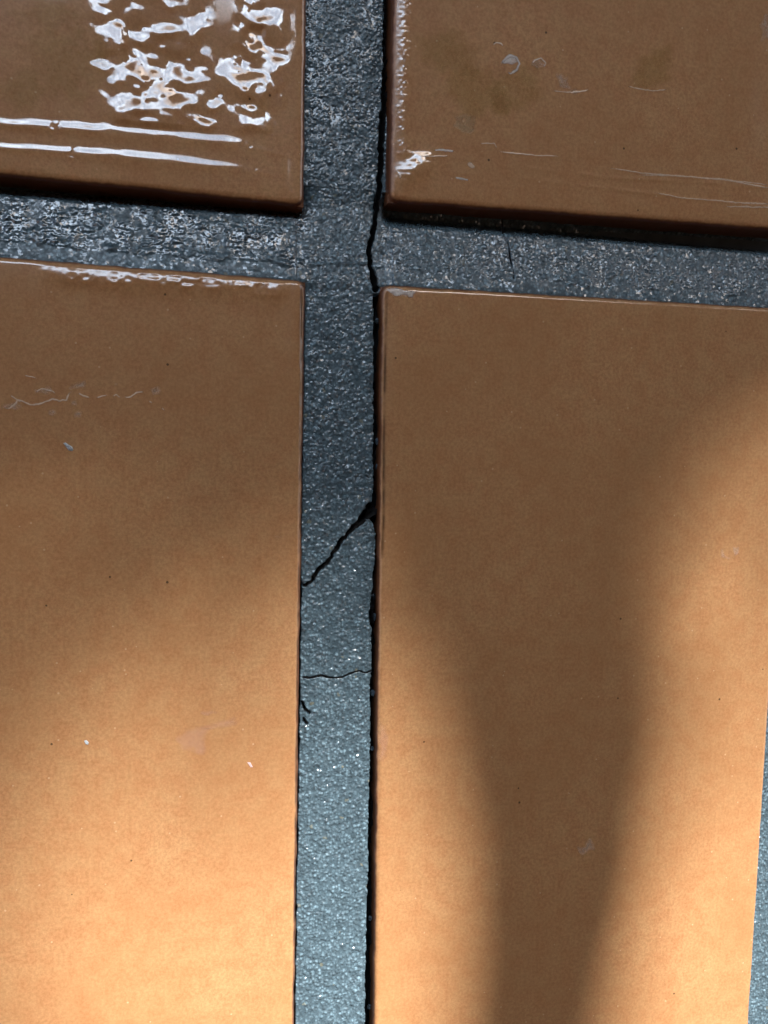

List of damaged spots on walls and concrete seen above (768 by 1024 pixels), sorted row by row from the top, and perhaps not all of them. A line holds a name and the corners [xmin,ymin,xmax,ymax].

crack [295,0,388,1024]